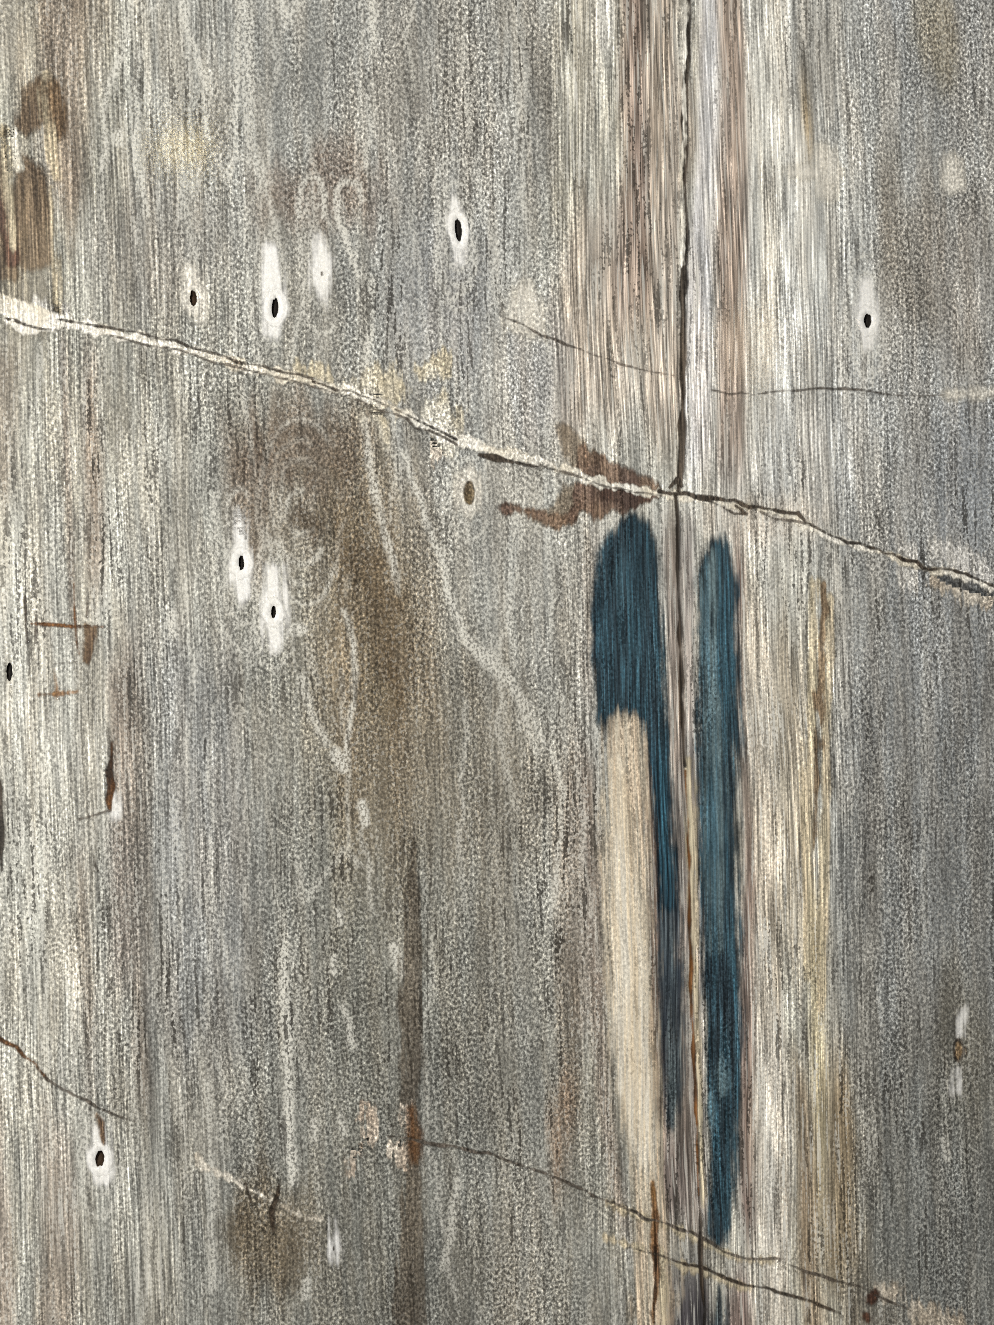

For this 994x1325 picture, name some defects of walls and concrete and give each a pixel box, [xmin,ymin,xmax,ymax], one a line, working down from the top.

leakage [0,71,67,315]
crack [0,0,994,593]
crack [674,495,705,1204]
crack [0,1036,135,1122]
crack [194,1152,323,1232]
crack [388,1136,524,1167]
crack [530,1168,835,1312]
crack [792,1265,863,1296]
crack [863,1288,911,1323]